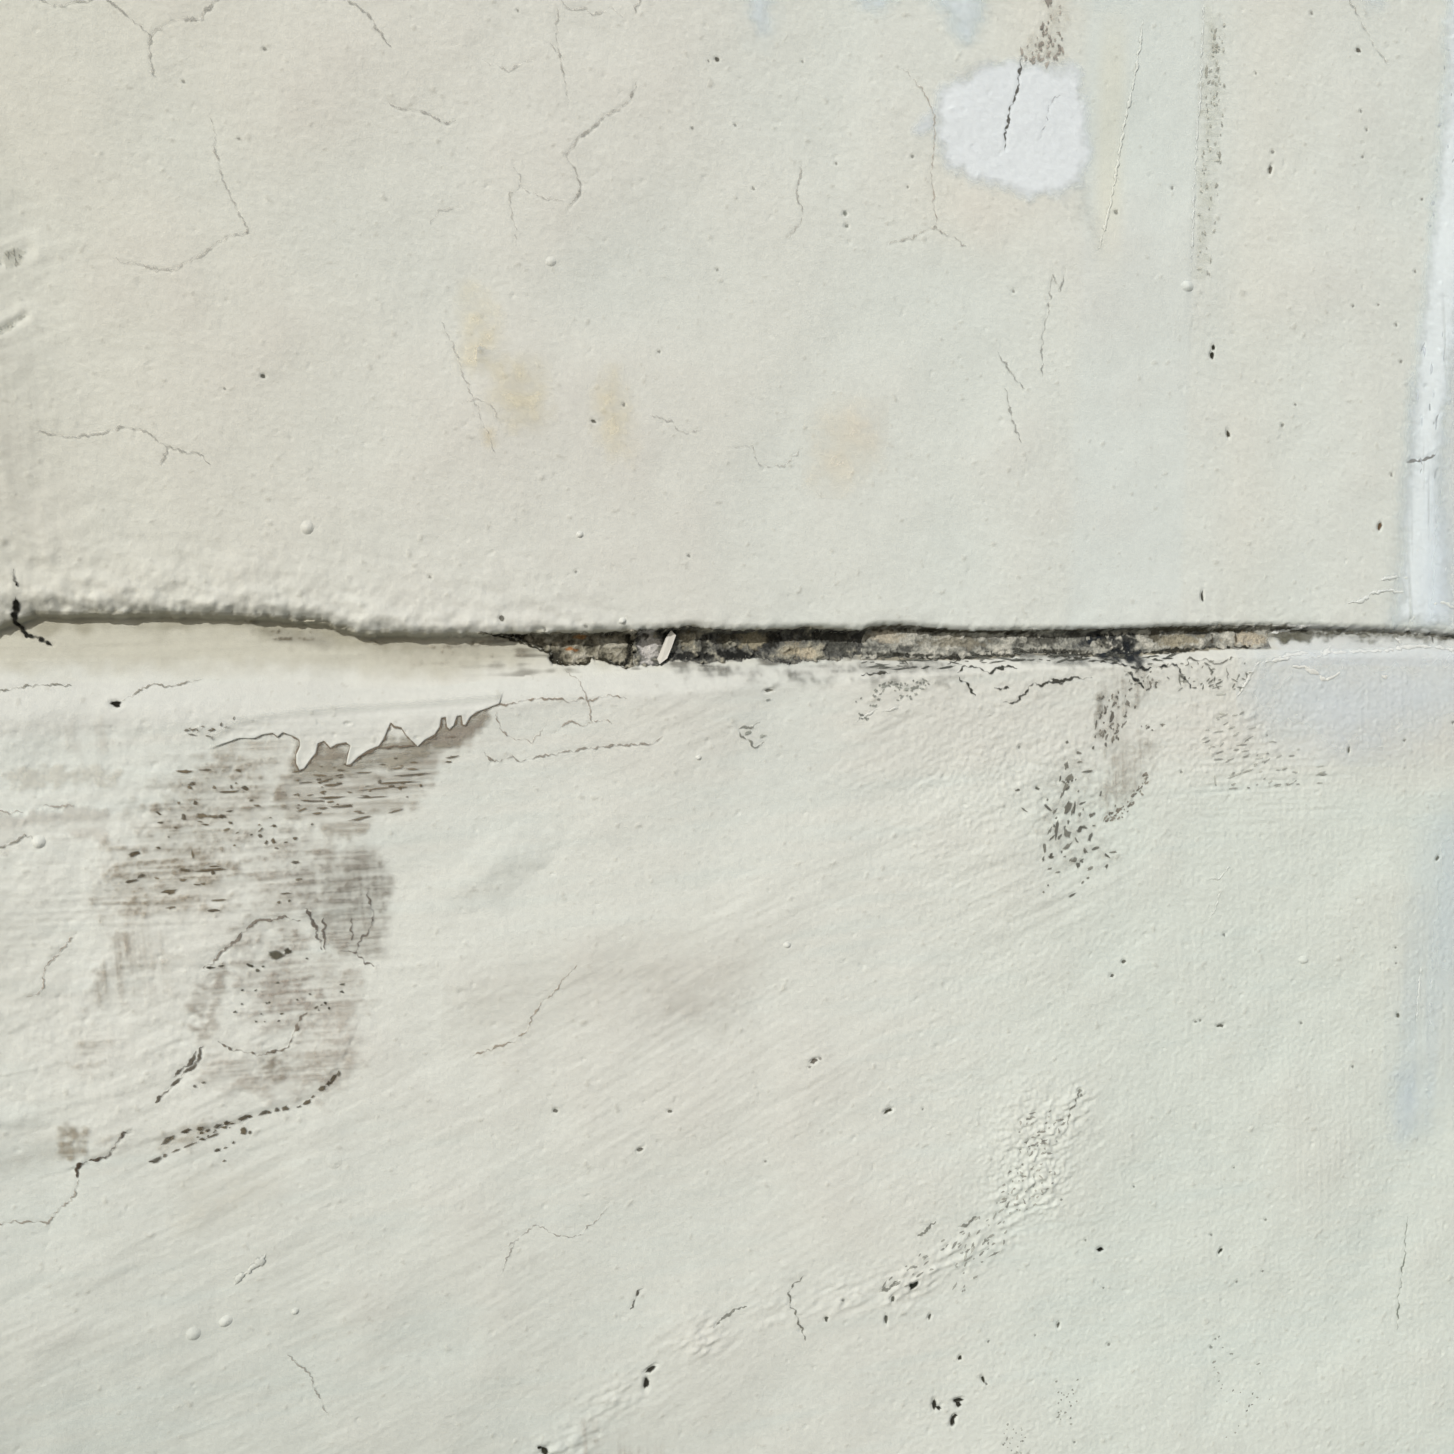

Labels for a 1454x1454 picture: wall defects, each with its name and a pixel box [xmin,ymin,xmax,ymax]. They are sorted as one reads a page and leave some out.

crack [60,0,153,72]
crack [10,569,51,645]
crack [0,683,70,691]
crack [862,627,1454,704]
water stain [294,715,486,772]